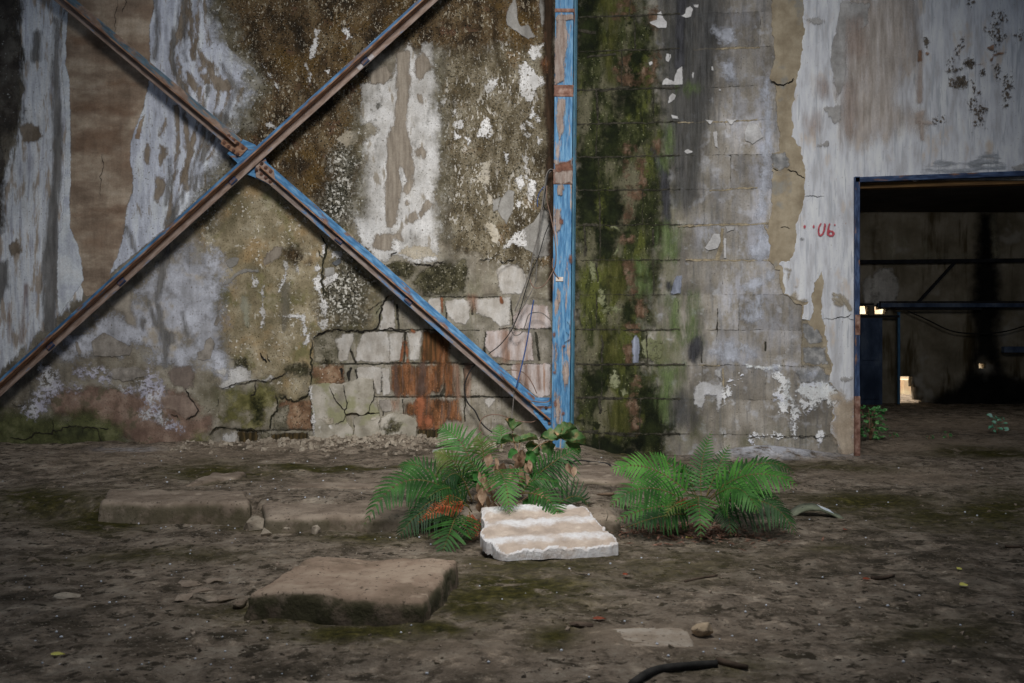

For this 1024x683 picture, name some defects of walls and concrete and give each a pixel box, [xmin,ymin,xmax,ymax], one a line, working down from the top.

damp [22,365,212,444]
peeling [0,0,236,374]
peeling [77,0,279,134]
damp [189,174,382,442]
crack [171,295,409,434]
damp [170,0,418,146]
damp [265,0,554,297]
rust [390,329,470,430]
rust [541,0,574,308]
peeling [648,6,667,28]
damp [650,0,736,259]
peeling [764,0,1024,446]